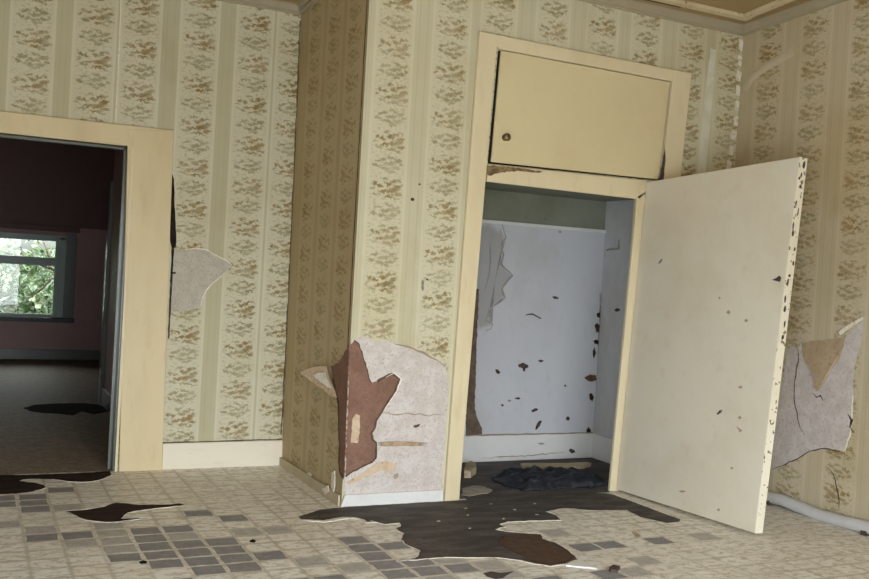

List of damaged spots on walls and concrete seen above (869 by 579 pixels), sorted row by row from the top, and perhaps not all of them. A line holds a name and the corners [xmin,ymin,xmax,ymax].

flaking render [300,337,449,495]